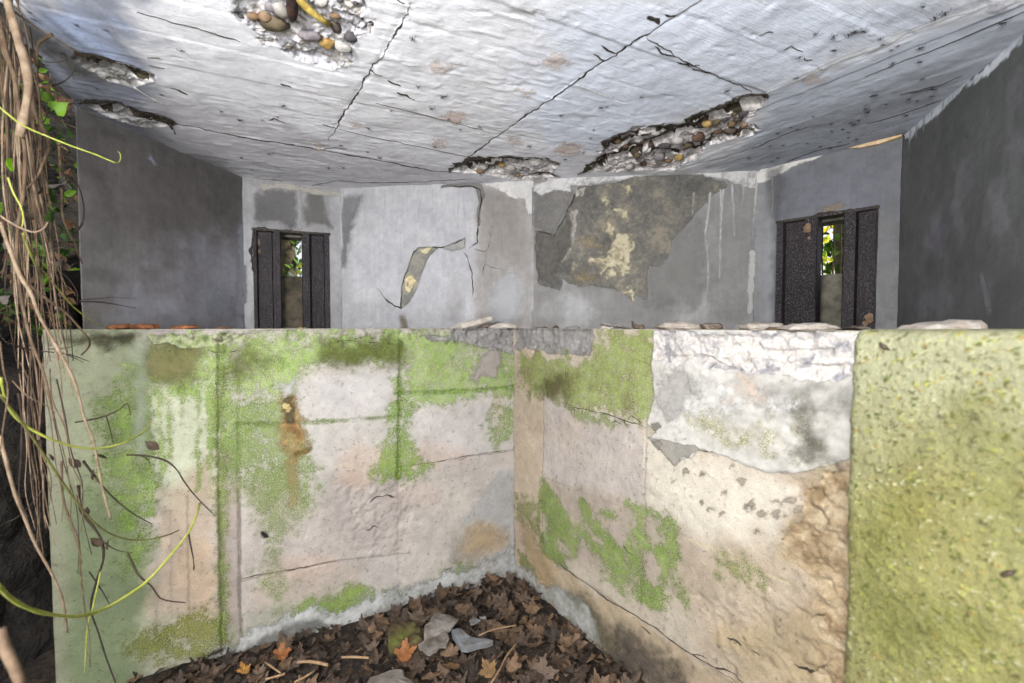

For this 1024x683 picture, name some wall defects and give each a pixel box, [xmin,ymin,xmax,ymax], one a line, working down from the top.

crack [137,12,240,42]
spalling [234,0,372,69]
crack [865,11,1024,77]
crack [172,0,752,186]
spalling [448,156,561,181]
spalling [577,94,769,175]
crack [867,76,962,124]
water stain [379,155,822,328]
water stain [321,338,405,366]
spalling [652,330,857,383]
water stain [69,334,203,453]
corrosion [278,394,312,506]